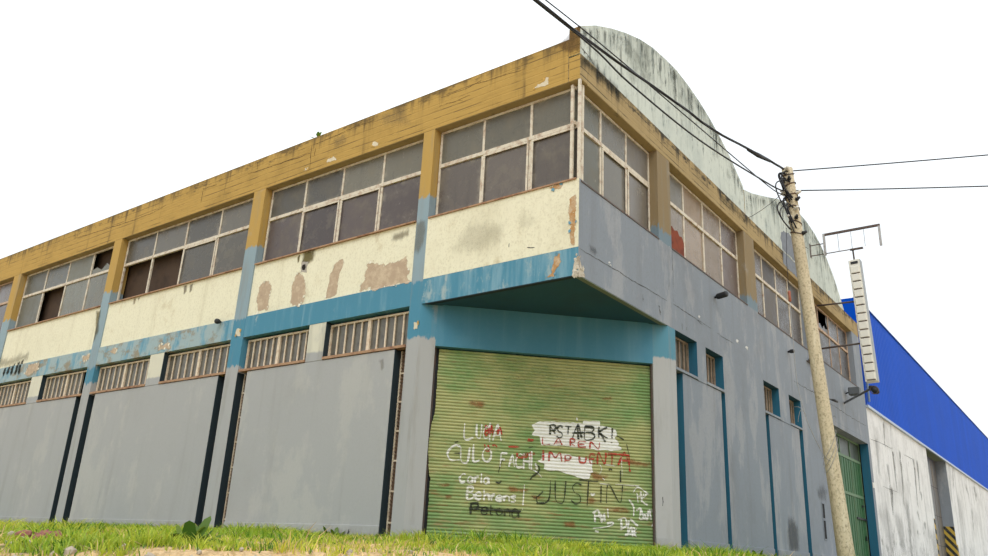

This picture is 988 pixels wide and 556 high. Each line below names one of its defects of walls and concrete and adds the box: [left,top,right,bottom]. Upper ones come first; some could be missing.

leakage [561,27,619,96]
peeling [568,195,585,278]
peeling [256,281,272,314]
peeling [290,262,308,307]
peeling [325,259,344,298]
peeling [359,256,410,292]
peeling [547,252,561,278]